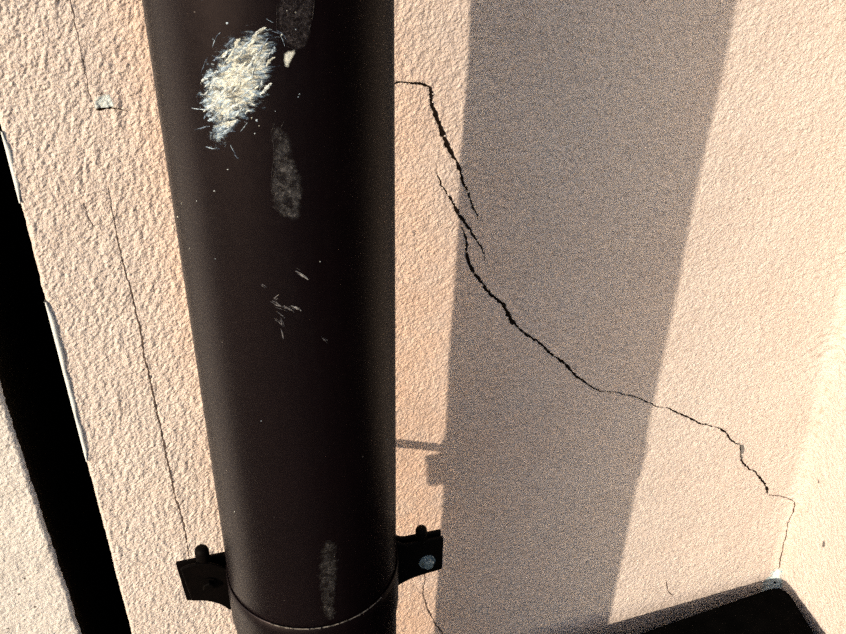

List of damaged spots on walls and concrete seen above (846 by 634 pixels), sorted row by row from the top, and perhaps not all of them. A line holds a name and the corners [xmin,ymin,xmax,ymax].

crack [395,81,795,568]
crack [422,574,443,634]